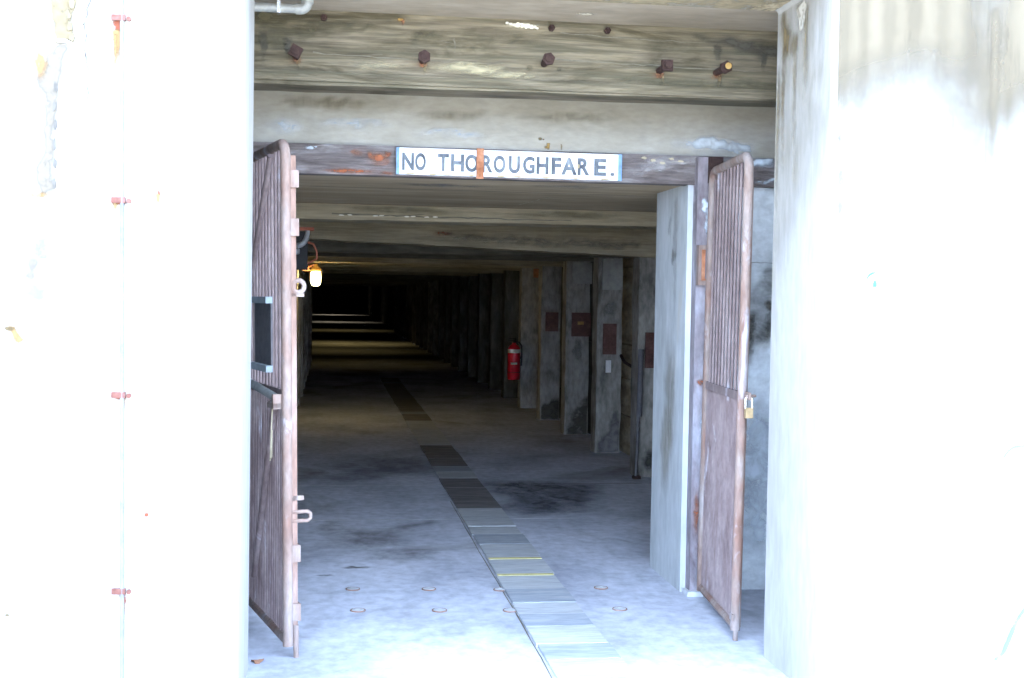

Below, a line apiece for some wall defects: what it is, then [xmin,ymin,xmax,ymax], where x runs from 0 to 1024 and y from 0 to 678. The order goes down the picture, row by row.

peeling [29,0,77,197]
damp [838,0,1024,134]
damp [749,302,771,355]
damp [493,482,592,513]
damp [744,423,769,535]